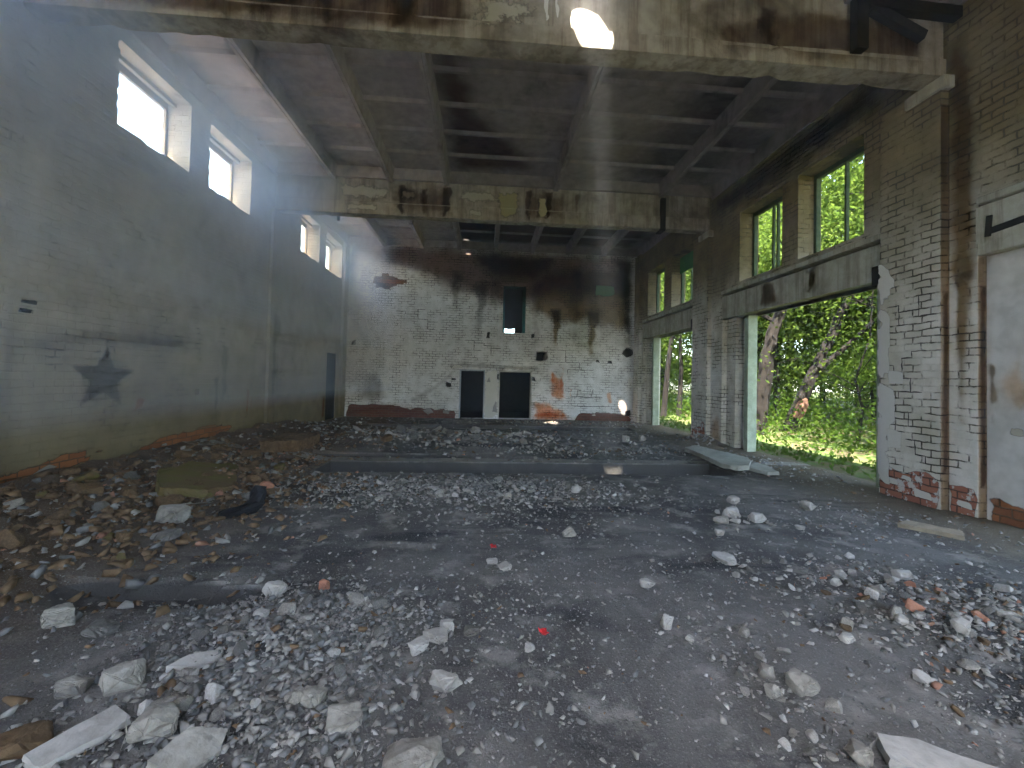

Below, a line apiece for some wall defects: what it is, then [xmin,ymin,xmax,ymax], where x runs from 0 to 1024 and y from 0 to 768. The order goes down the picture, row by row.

spalling [373,273,407,290]
leakage [537,271,627,345]
peeling [877,265,977,518]
flaking render [346,404,455,418]
flaking render [575,410,631,421]
flaking render [0,450,101,484]
flaking render [990,498,1024,529]